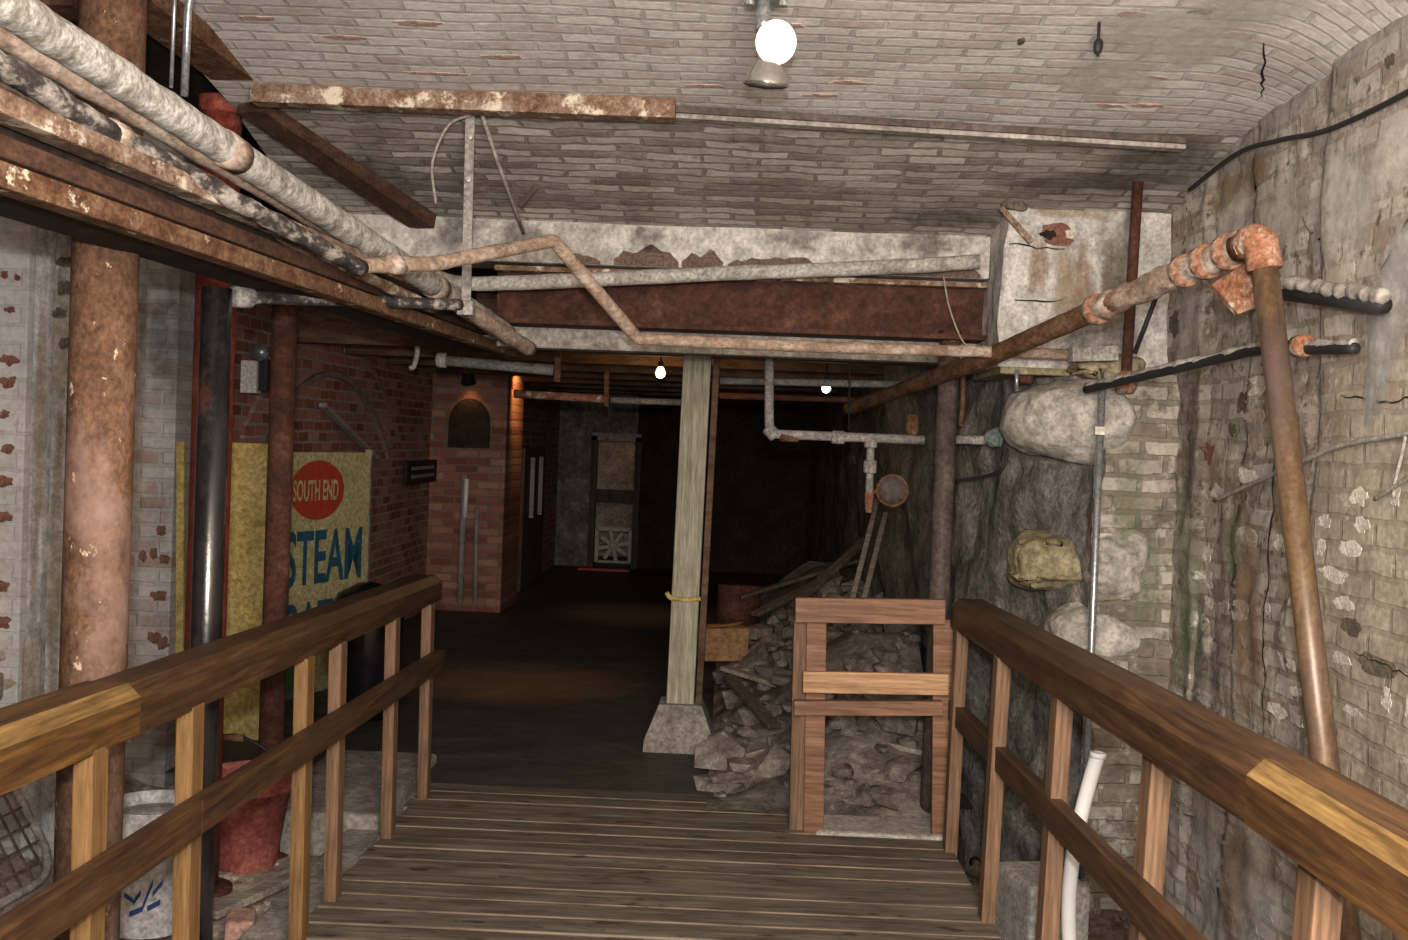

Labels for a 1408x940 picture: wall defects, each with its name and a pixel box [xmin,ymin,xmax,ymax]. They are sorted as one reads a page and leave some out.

crack [1259,43,1267,97]
spalling [574,244,813,268]
spalling [887,270,981,278]
crack [1380,218,1408,271]